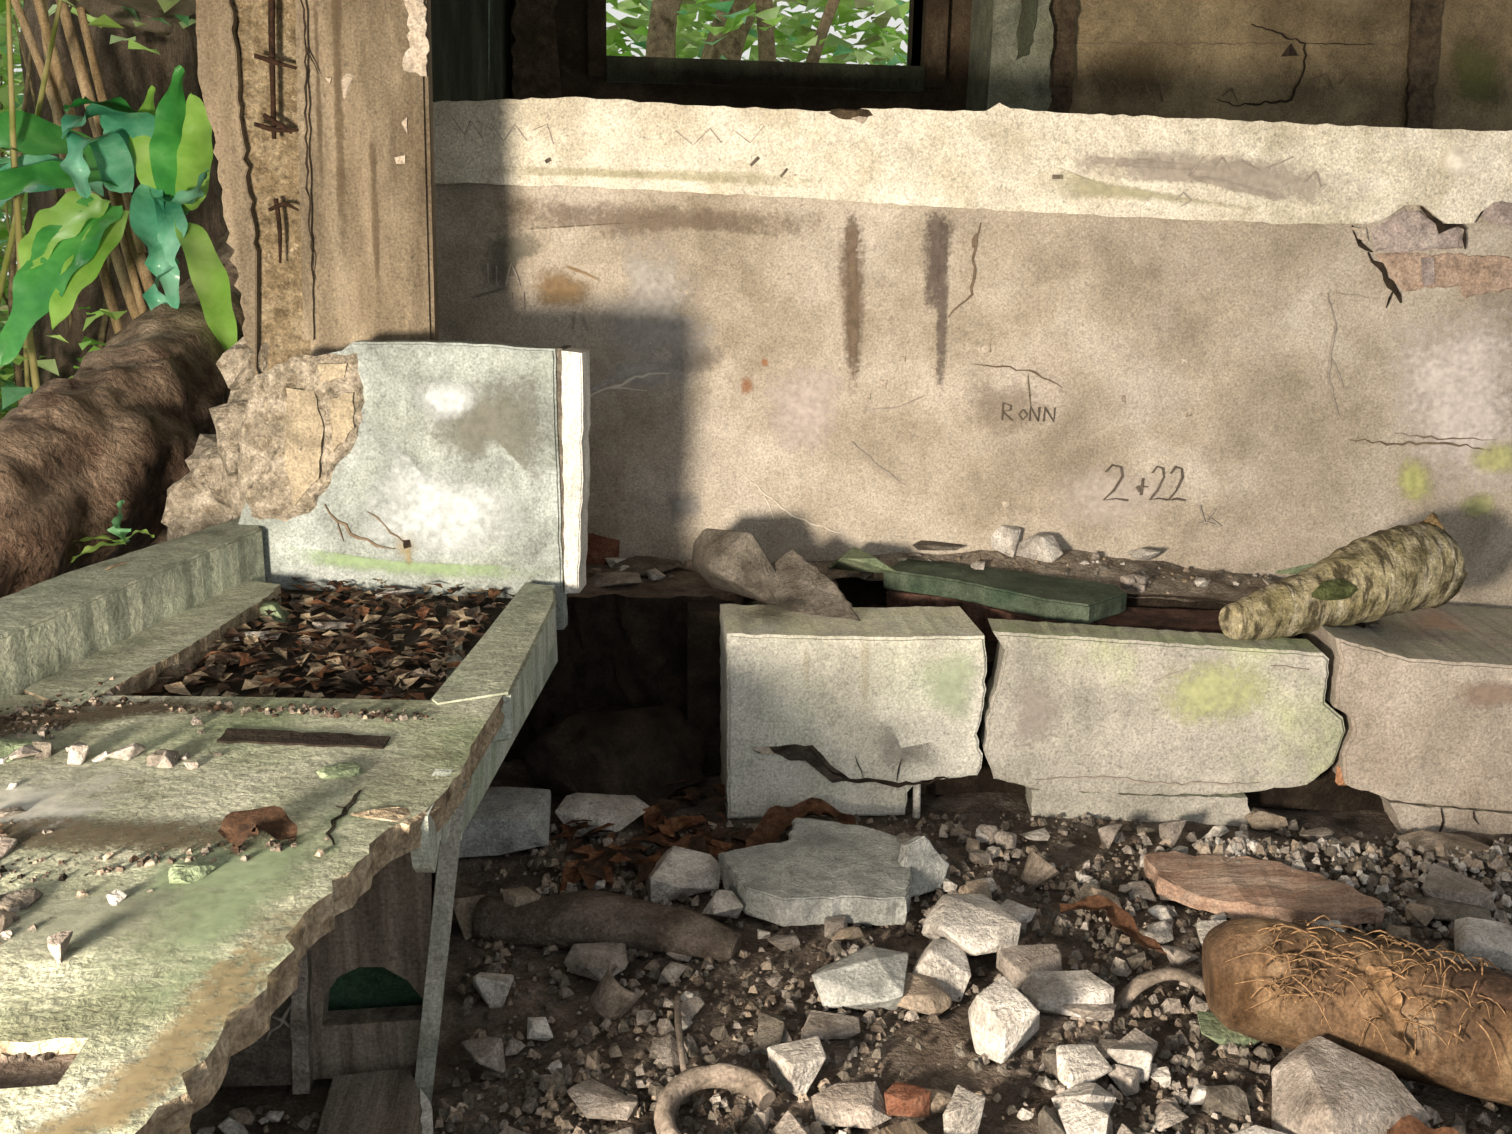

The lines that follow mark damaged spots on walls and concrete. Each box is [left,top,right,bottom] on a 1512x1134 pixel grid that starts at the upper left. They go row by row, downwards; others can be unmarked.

crack [1077,24,1403,107]
spalling [234,0,365,522]
water stain [840,218,863,374]
water stain [924,213,953,382]
spalling [1351,205,1512,299]
spalling [1481,201,1512,226]
crack [754,746,951,788]